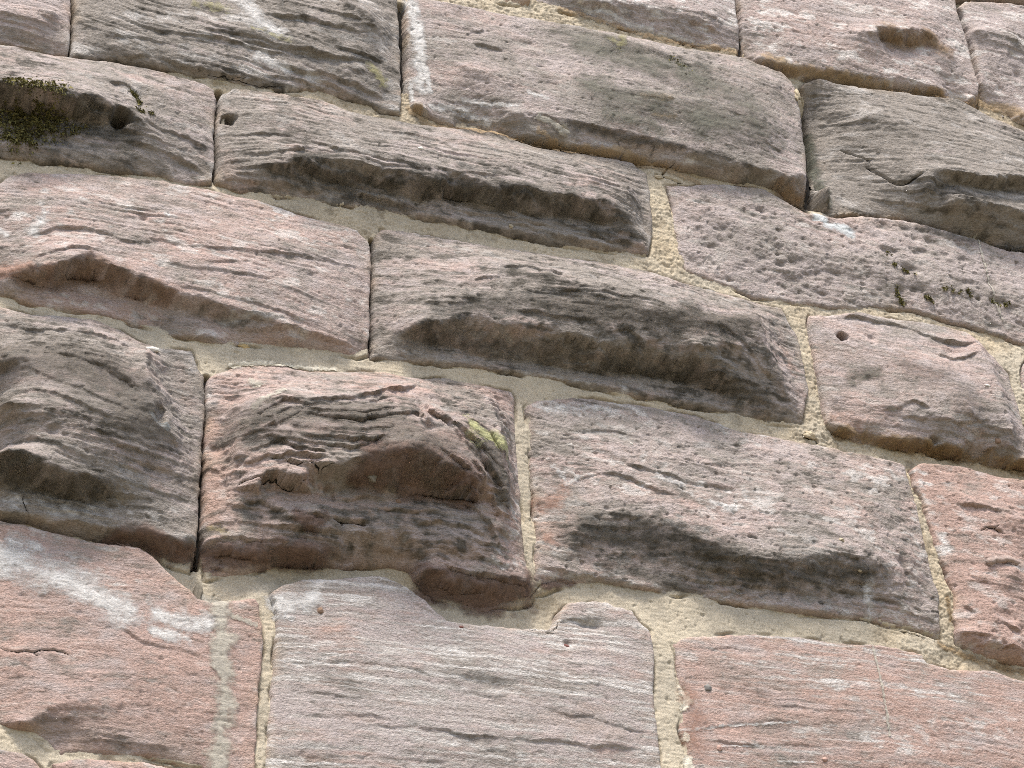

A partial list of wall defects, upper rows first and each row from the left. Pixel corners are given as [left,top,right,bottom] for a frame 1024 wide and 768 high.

leakage [0,538,138,627]
leakage [149,594,217,641]